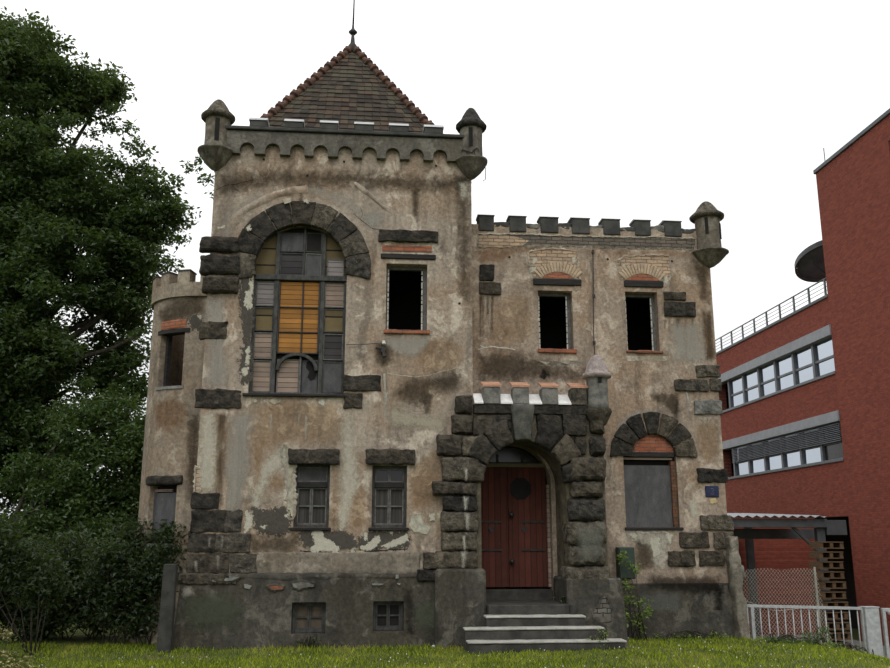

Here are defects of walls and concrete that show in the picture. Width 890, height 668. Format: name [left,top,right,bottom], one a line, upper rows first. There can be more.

spalling [237,278,256,386]
water stain [199,413,249,510]
water stain [252,453,284,508]
spalling [243,442,441,553]